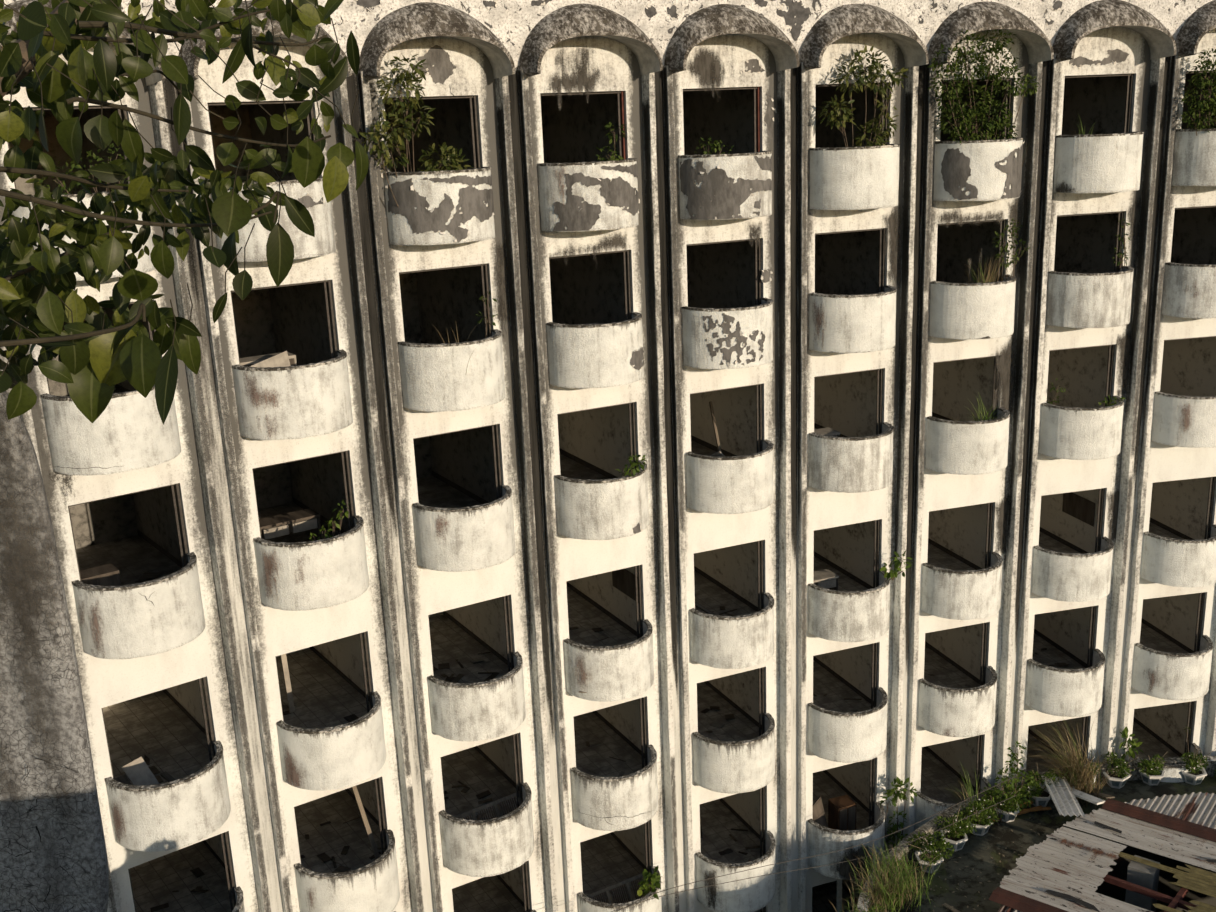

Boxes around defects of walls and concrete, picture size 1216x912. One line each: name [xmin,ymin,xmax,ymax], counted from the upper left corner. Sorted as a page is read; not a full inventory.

peeling [755,0,821,43]
peeling [409,45,459,84]
peeling [376,150,494,243]
peeling [553,164,640,231]
peeling [680,156,773,220]
peeling [941,148,978,200]
peeling [995,142,1024,199]
peeling [703,313,765,367]
water stain [194,372,212,463]
water stain [209,336,285,912]
rust [1061,839,1117,858]
water stain [283,877,291,912]